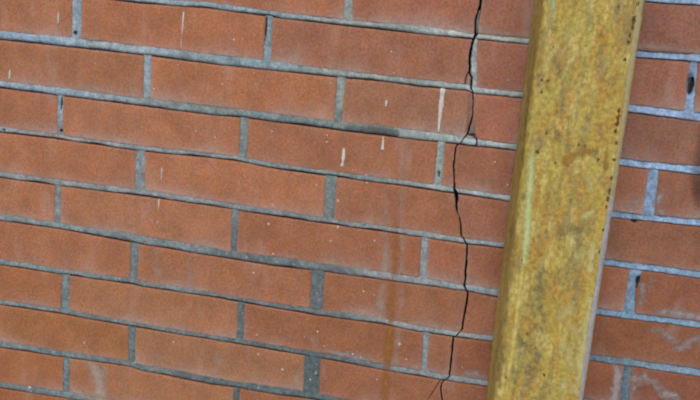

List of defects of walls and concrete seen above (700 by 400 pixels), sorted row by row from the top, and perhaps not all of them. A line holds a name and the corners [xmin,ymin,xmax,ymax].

leakage [438,88,446,132]
crack [428,0,482,400]